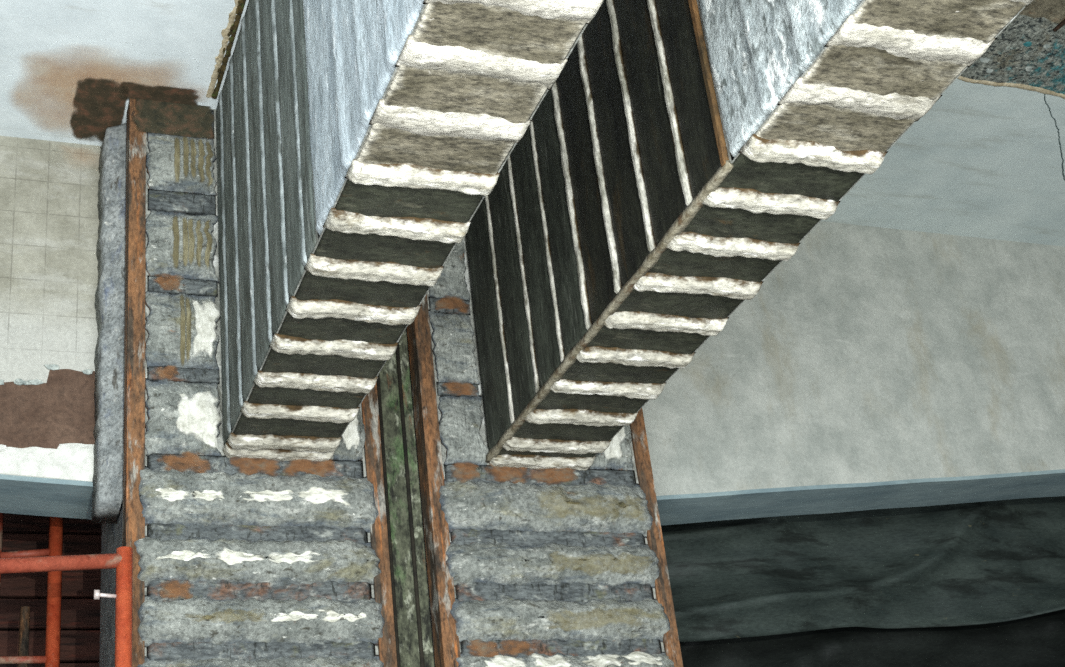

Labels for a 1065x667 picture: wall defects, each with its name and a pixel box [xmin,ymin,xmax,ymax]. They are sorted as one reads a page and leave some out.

spalling [957,0,1065,99]
rust [36,63,214,141]
crack [1044,94,1065,180]
peeling [0,364,95,481]